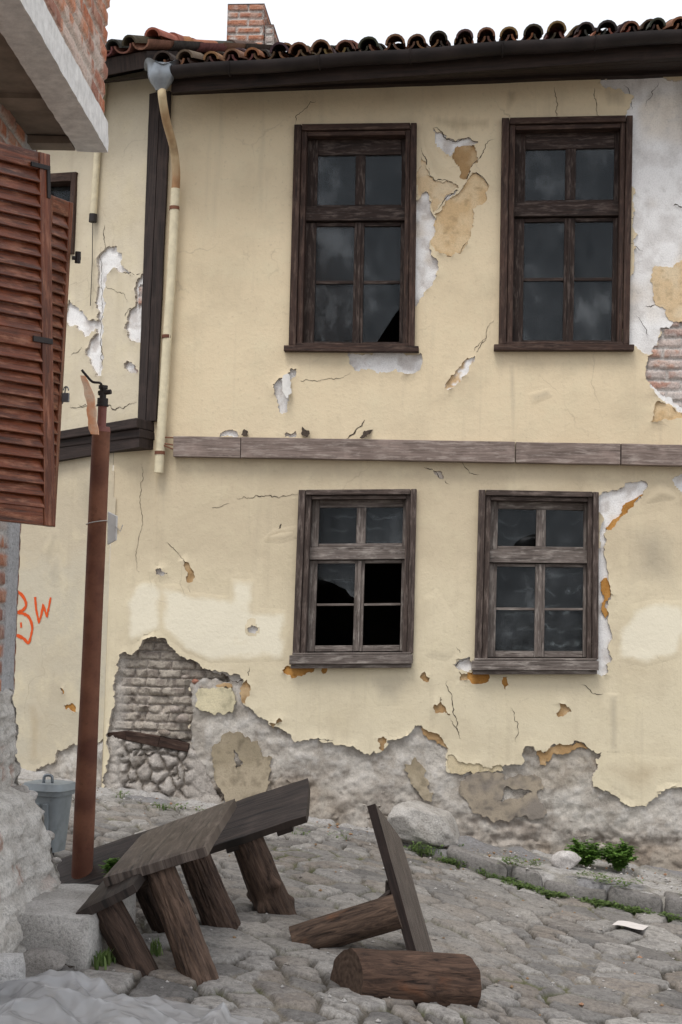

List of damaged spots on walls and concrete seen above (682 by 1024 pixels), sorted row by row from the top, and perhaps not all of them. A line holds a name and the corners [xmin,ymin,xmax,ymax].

flaking render [67,247,143,376]
flaking render [274,369,296,414]
flaking render [348,353,423,374]
peeling [415,129,489,306]
peeling [445,357,475,390]
flaking render [600,78,682,422]
flaking render [596,481,648,676]
spalling [38,744,77,782]
spalling [96,637,682,872]